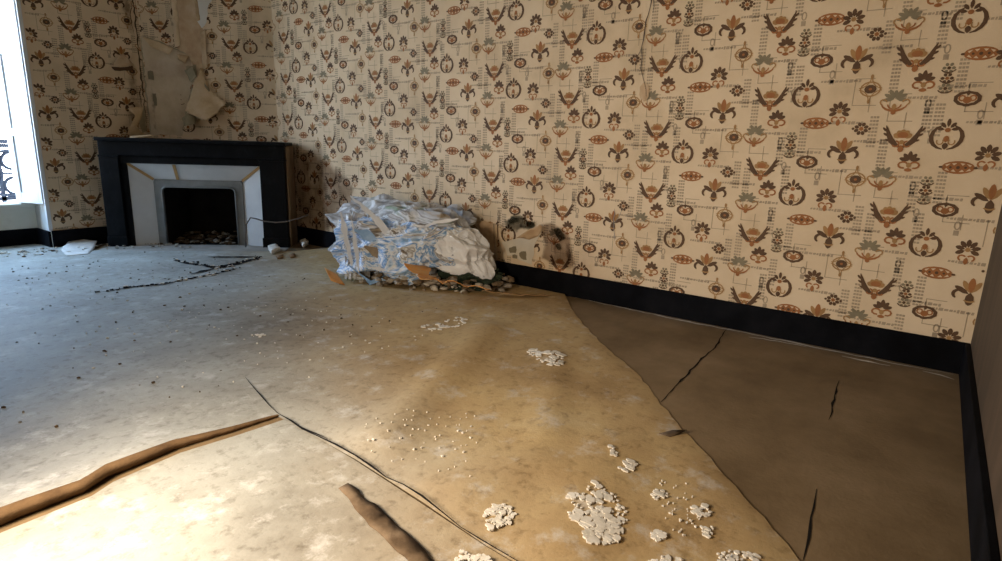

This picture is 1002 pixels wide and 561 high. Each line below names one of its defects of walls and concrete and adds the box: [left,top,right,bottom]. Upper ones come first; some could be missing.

crack [661,328,728,402]
crack [829,381,839,419]
crack [803,489,817,560]